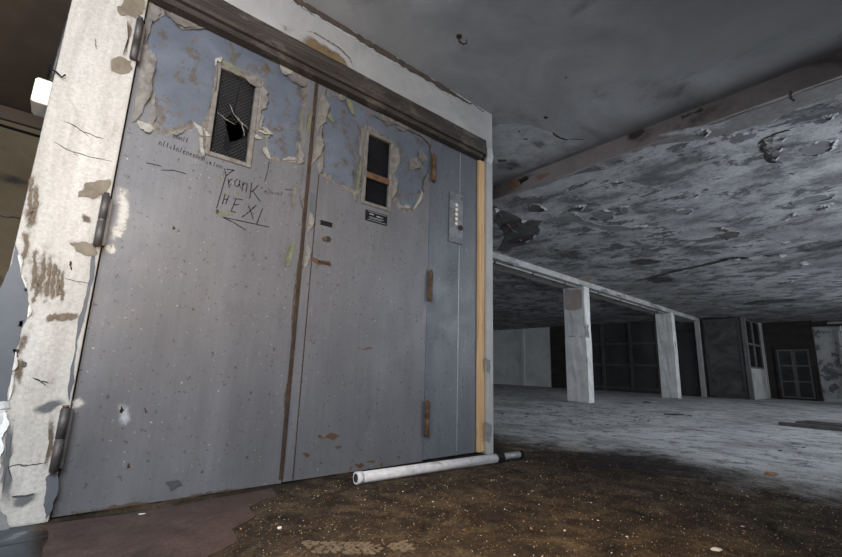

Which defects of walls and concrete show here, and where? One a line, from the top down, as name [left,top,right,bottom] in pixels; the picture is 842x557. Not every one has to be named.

peeling [132,2,432,212]
peeling [487,123,624,213]
peeling [725,129,759,144]
peeling [798,139,839,157]
peeling [811,112,839,125]
peeling [304,211,314,267]
peeling [553,205,650,232]
peeling [565,276,594,310]
peeling [68,255,95,401]
flaking render [0,245,32,468]
flaking render [43,472,59,519]
flaking render [0,511,11,531]